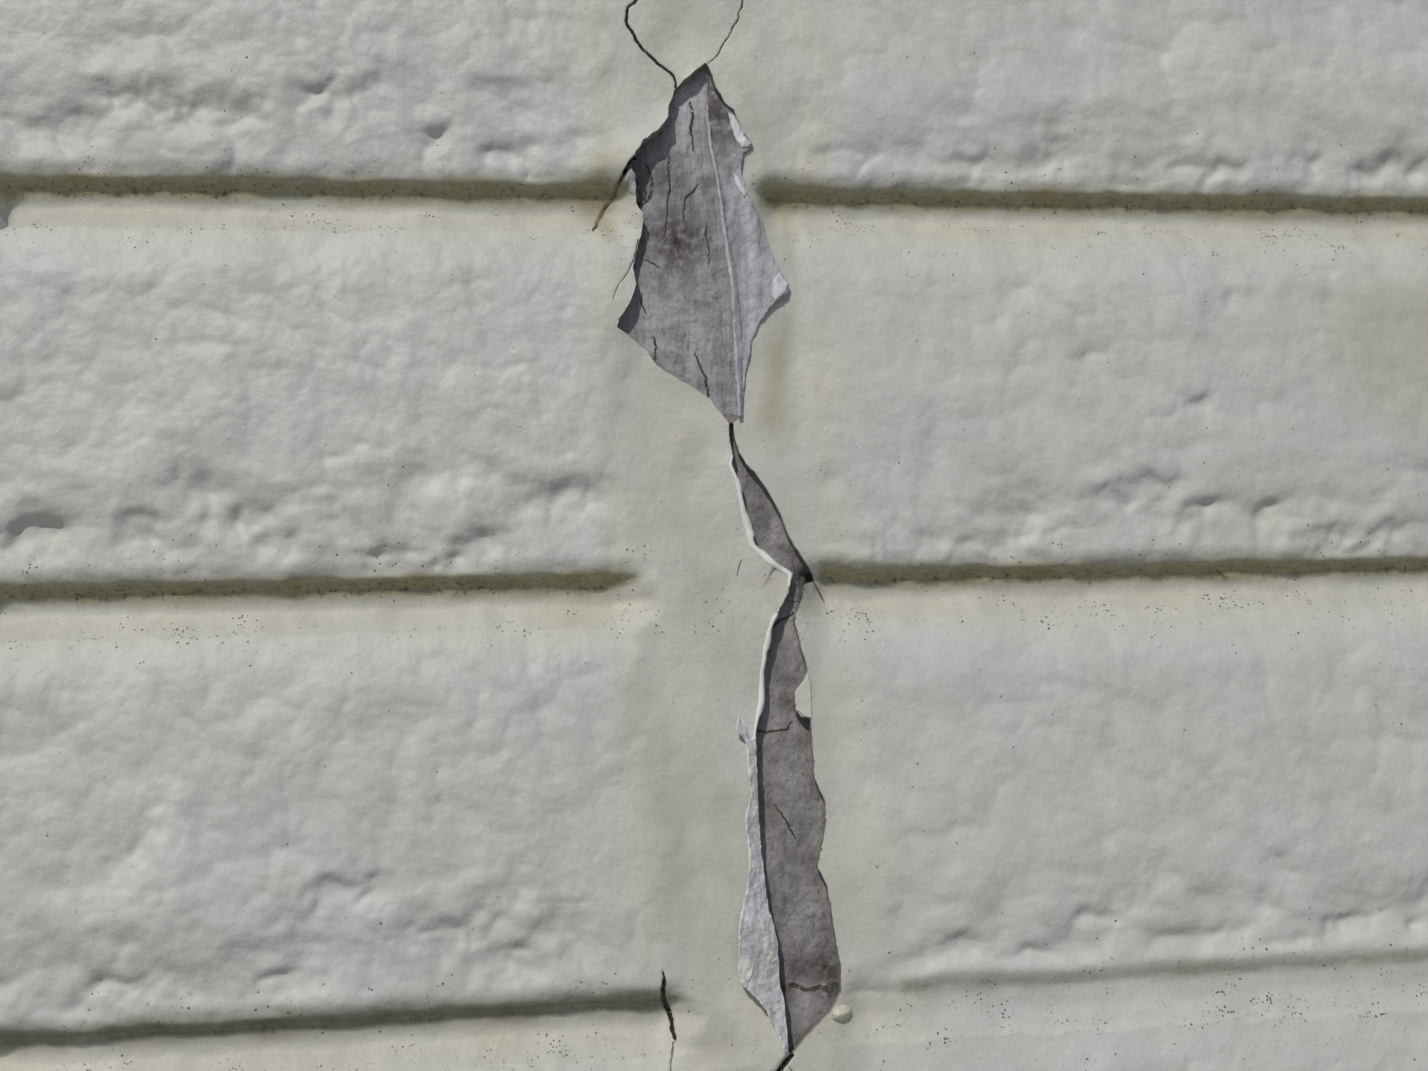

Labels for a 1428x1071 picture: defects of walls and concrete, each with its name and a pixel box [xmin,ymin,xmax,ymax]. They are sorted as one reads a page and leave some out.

crack [625,0,677,88]
crack [708,0,743,63]
crack [583,157,637,232]
crack [612,239,638,300]
peeling [617,62,842,1054]
crack [661,971,676,1071]
crack [777,1053,794,1071]